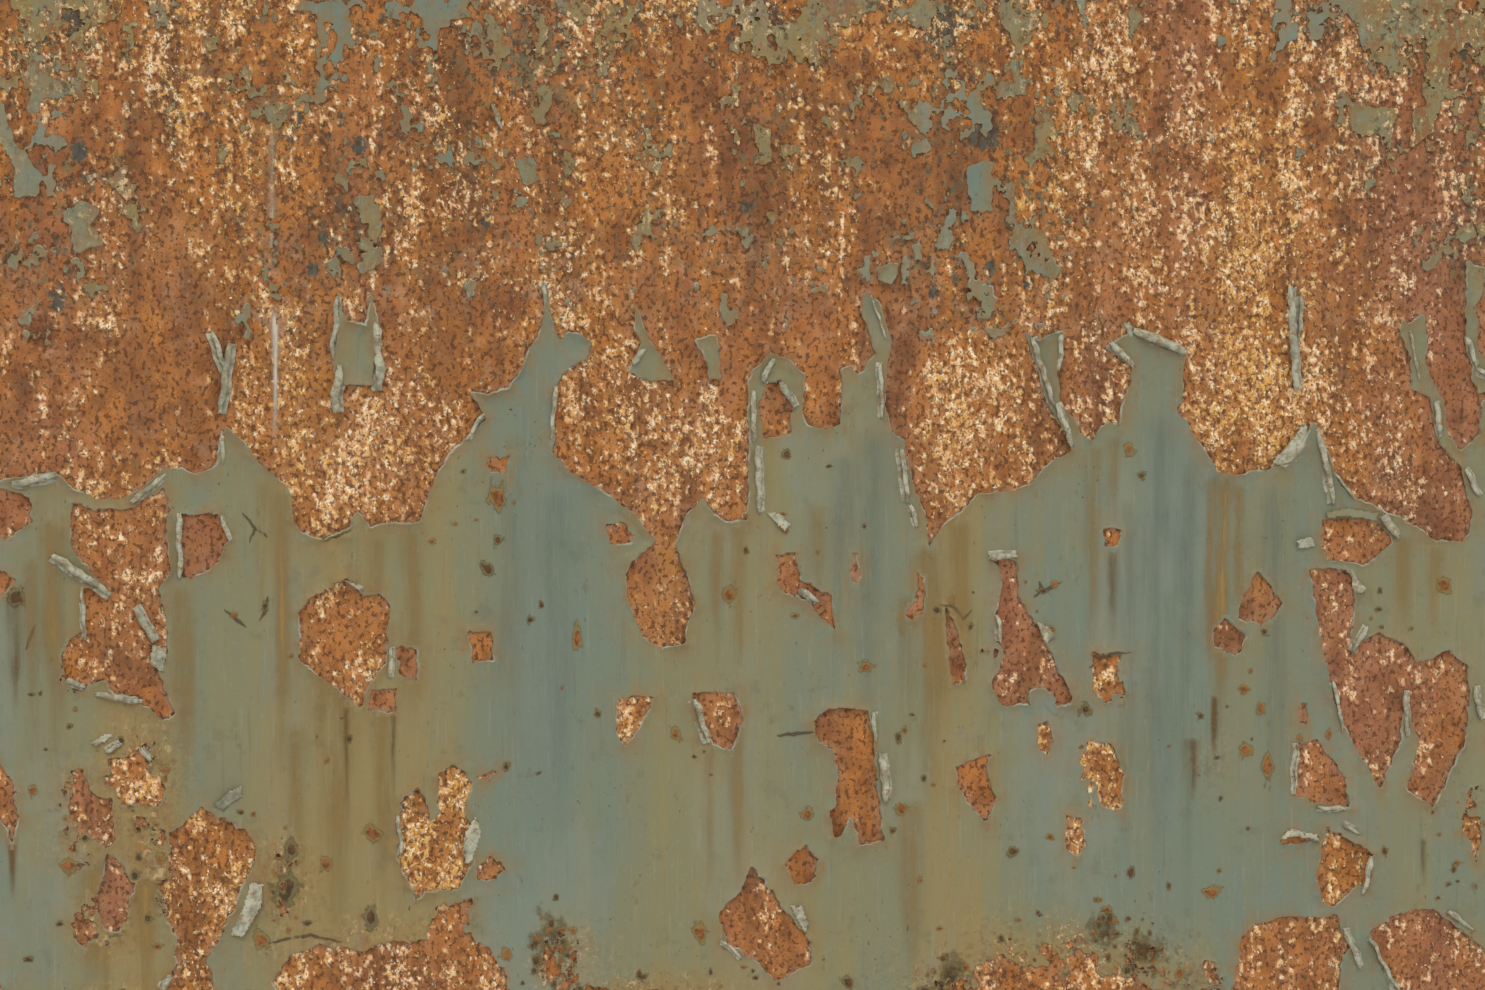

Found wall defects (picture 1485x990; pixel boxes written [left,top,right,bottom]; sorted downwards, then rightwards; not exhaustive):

rust [0,0,1485,650]
peeling [48,488,233,720]
peeling [298,579,418,713]
rust [1195,668,1266,760]
peeling [1297,507,1485,807]
peeling [59,734,297,990]
rust [252,826,312,955]
rust [363,905,379,932]
peeling [273,765,509,990]
rust [501,894,589,990]
rust [1086,897,1164,977]
peeling [934,703,1485,990]